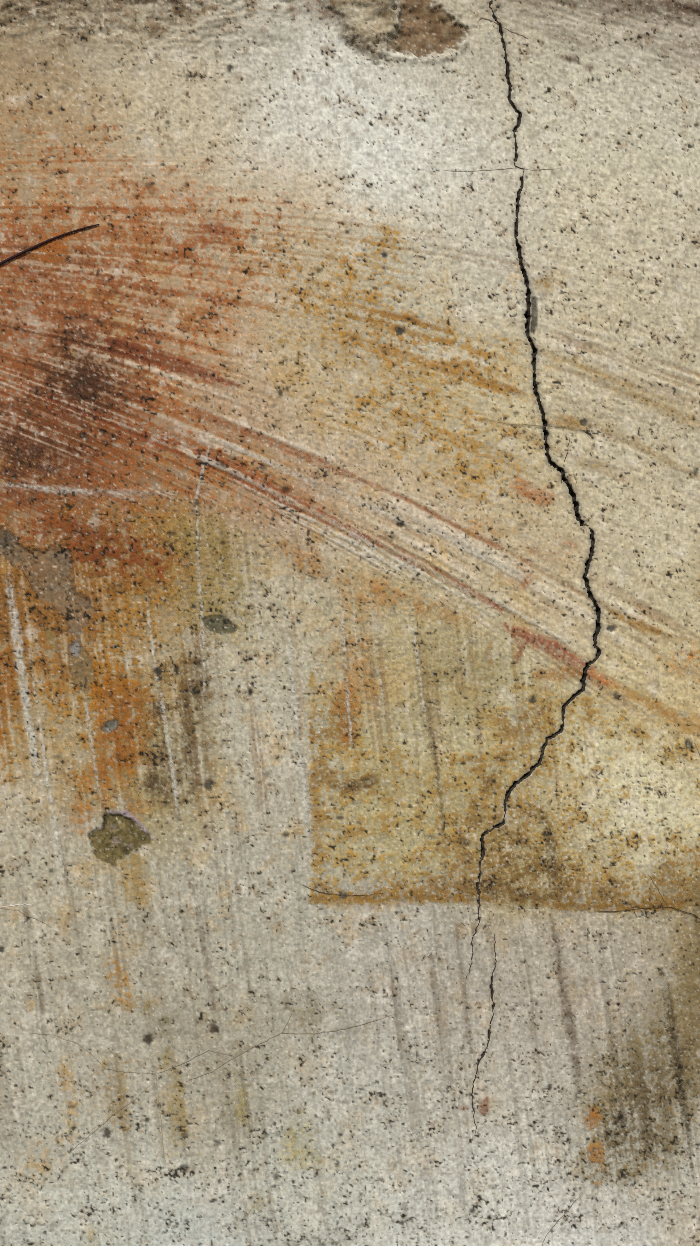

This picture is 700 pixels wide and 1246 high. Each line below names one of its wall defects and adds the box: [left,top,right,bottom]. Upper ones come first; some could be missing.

spalling [0,0,218,70]
spalling [311,0,469,60]
corrosion [0,125,383,834]
crack [444,0,601,1133]
peeling [0,529,94,692]
corrosion [506,625,618,687]
corrosion [617,614,671,637]
spalling [88,808,153,866]